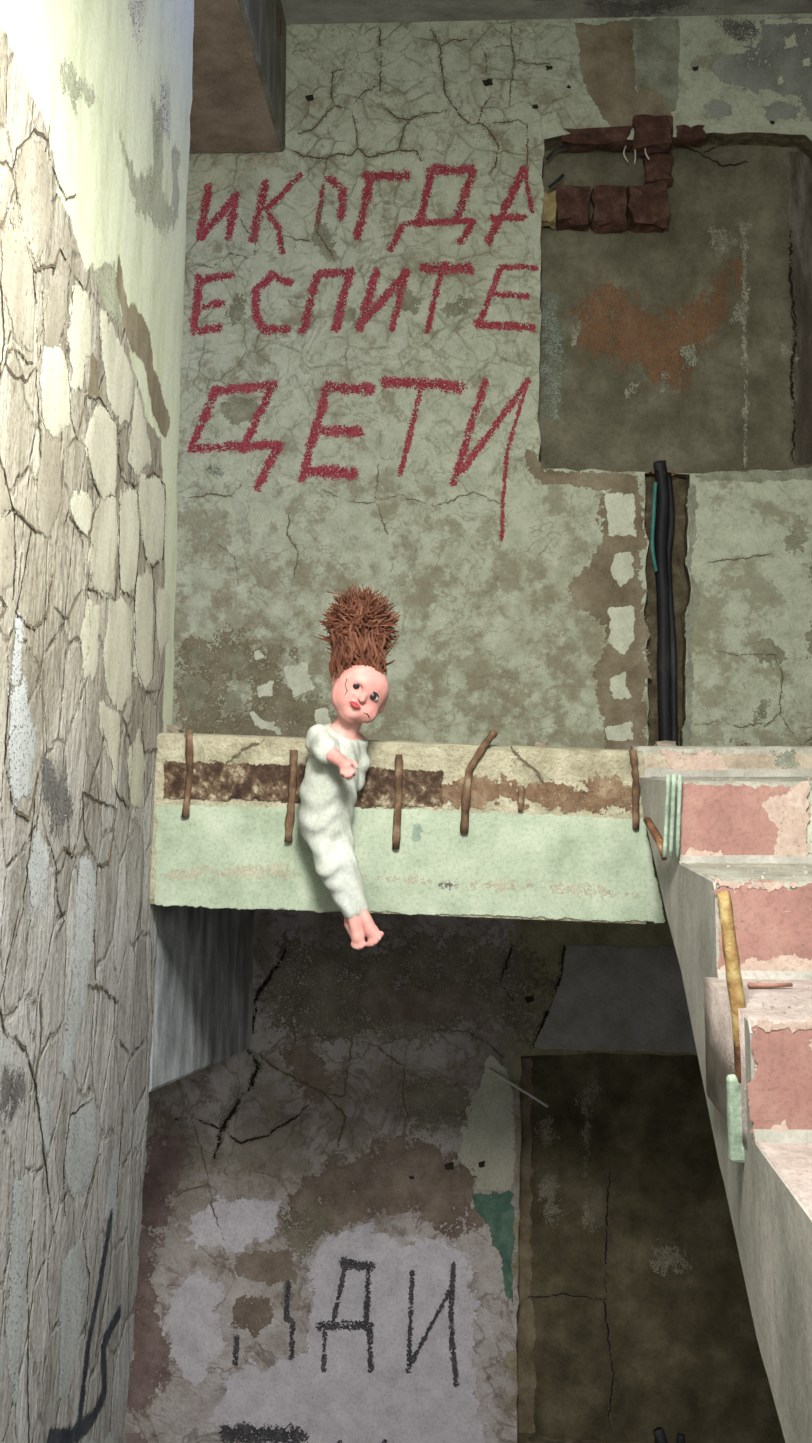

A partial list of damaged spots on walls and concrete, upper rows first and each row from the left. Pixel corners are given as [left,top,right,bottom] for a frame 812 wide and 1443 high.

crack [196,24,551,268]
spalling [554,14,812,234]
flaking render [0,26,171,1443]
crack [0,112,244,1443]
crack [325,464,506,535]
peeling [524,449,658,750]
spalling [681,467,812,746]
peeling [715,878,799,894]
peeling [718,953,812,971]
peeling [762,780,811,856]
crack [173,944,566,1241]
flaking render [158,1132,516,1388]